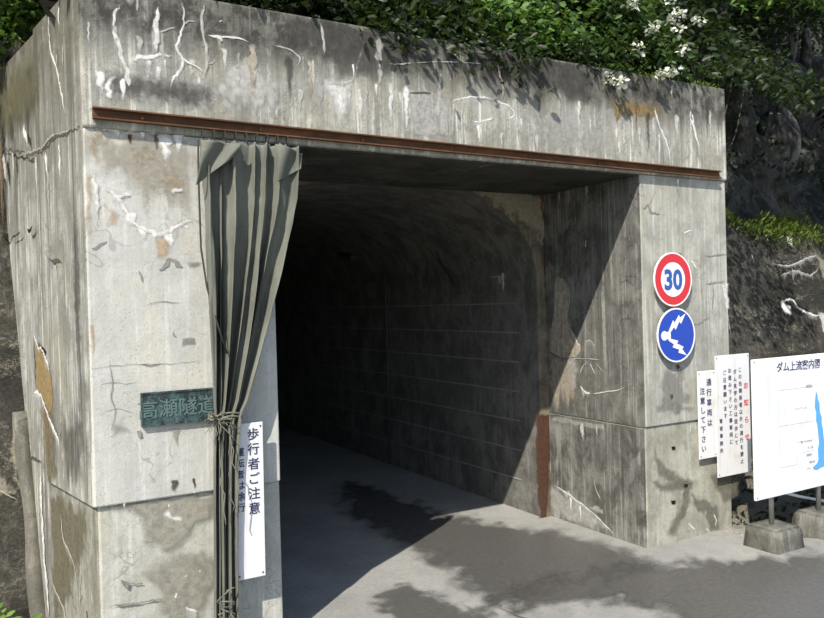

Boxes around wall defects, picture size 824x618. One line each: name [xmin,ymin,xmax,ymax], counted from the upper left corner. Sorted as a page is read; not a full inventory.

crack [2,125,79,212]
crack [4,226,61,274]
spalling [159,258,199,270]
spalling [33,333,53,411]
corrosion [536,414,551,518]
damp [655,459,718,533]
damp [713,474,738,500]
damp [343,479,824,618]